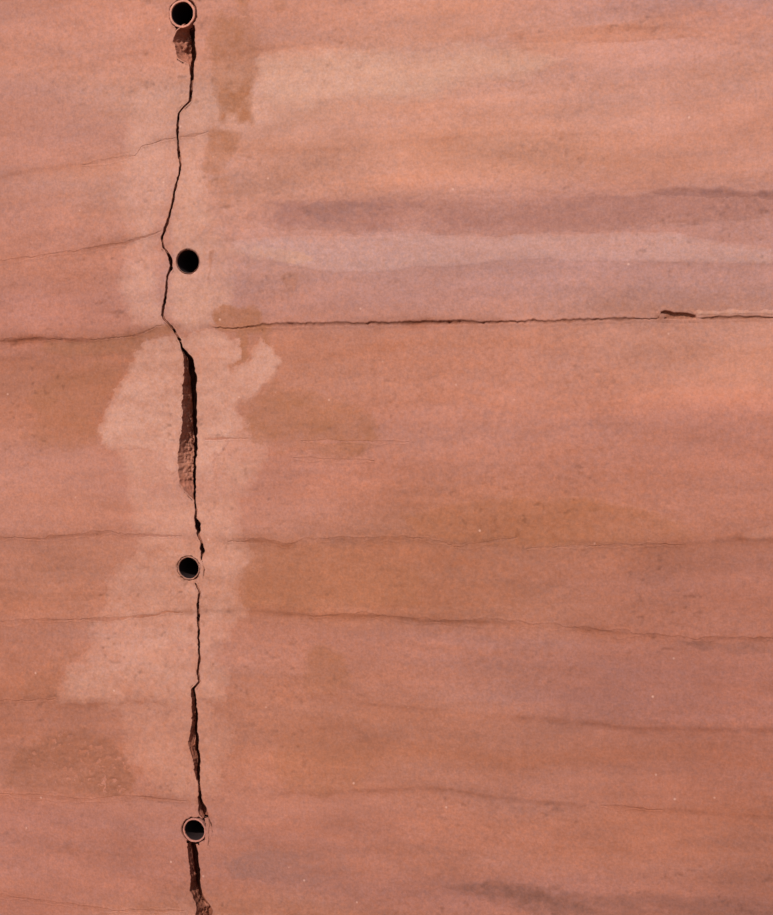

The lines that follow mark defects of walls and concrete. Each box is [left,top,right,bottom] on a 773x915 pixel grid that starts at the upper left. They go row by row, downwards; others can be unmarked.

crack [0,23,215,915]
leakage [19,304,382,483]
crack [212,313,666,332]
crack [696,313,773,324]
leakage [116,448,424,801]